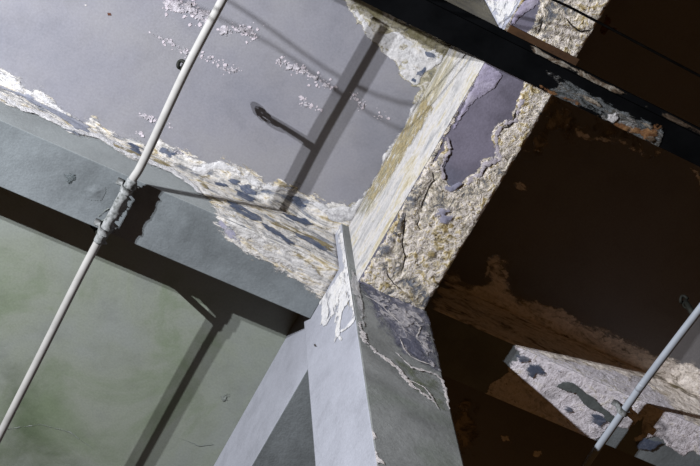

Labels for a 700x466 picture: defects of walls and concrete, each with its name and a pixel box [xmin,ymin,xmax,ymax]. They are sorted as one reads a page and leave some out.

damp [0,68,146,161]
peeling [276,56,338,90]
spalling [504,0,610,57]
corrosion [540,72,663,147]
damp [148,0,700,426]
spalling [360,63,553,309]
peeling [485,342,700,456]